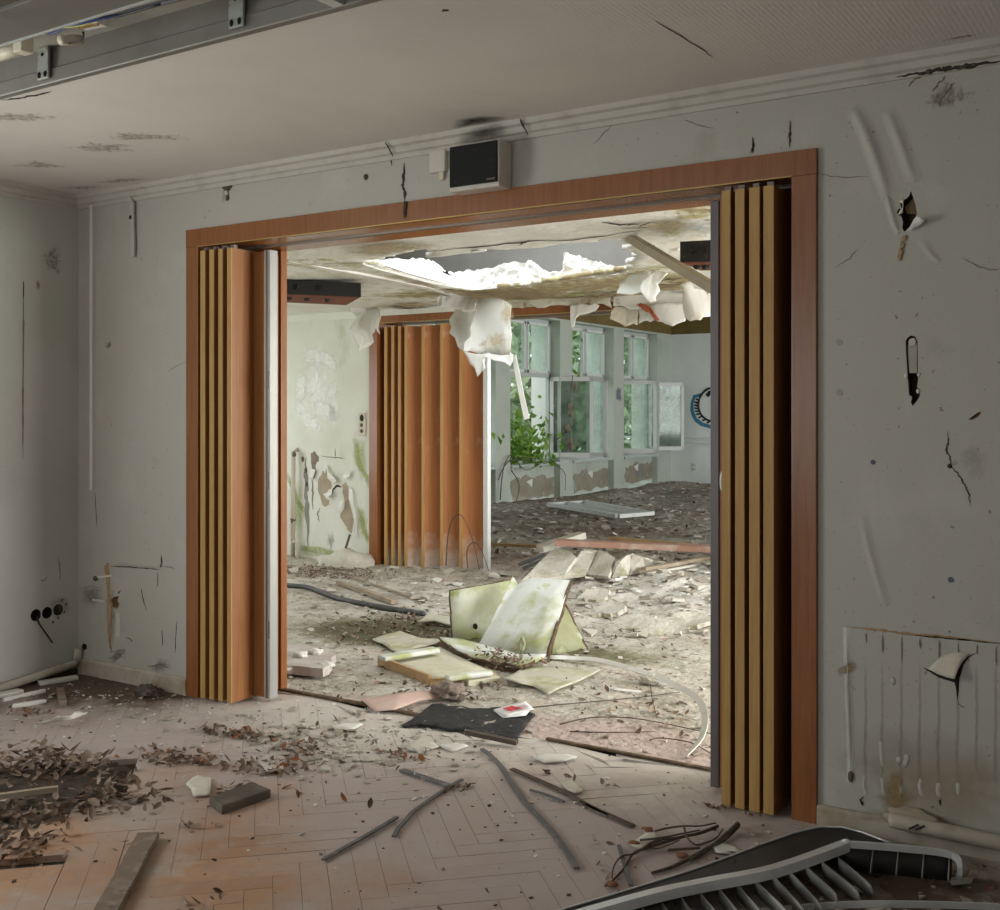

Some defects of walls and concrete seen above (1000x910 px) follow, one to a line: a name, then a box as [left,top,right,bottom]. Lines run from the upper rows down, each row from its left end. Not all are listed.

crack [656,21,711,56]
crack [898,61,1000,106]
crack [385,142,407,218]
spalling [897,192,925,261]
spalling [362,252,629,290]
spalling [906,336,920,406]
peeling [309,451,356,539]
peeling [510,474,554,502]
peeling [573,468,608,494]
peeling [624,461,652,484]
crack [945,433,970,502]